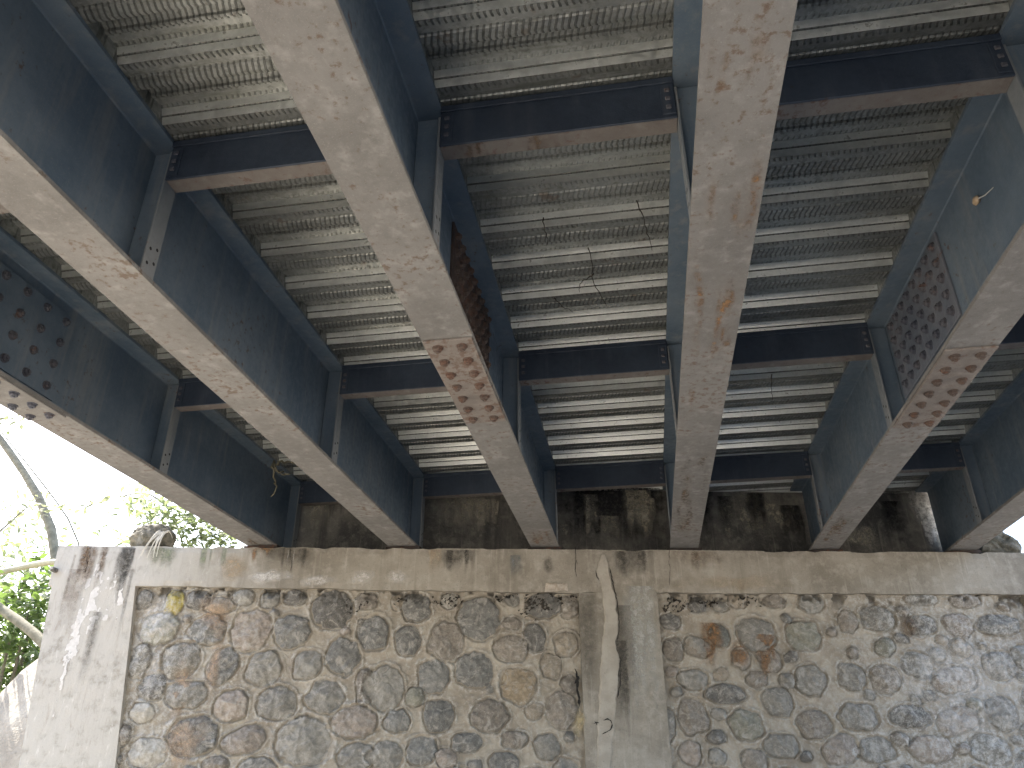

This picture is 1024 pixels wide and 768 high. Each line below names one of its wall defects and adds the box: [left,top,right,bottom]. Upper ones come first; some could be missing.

damp [560,488,666,536]
damp [78,547,107,577]
damp [118,547,135,582]
crack [575,547,622,734]